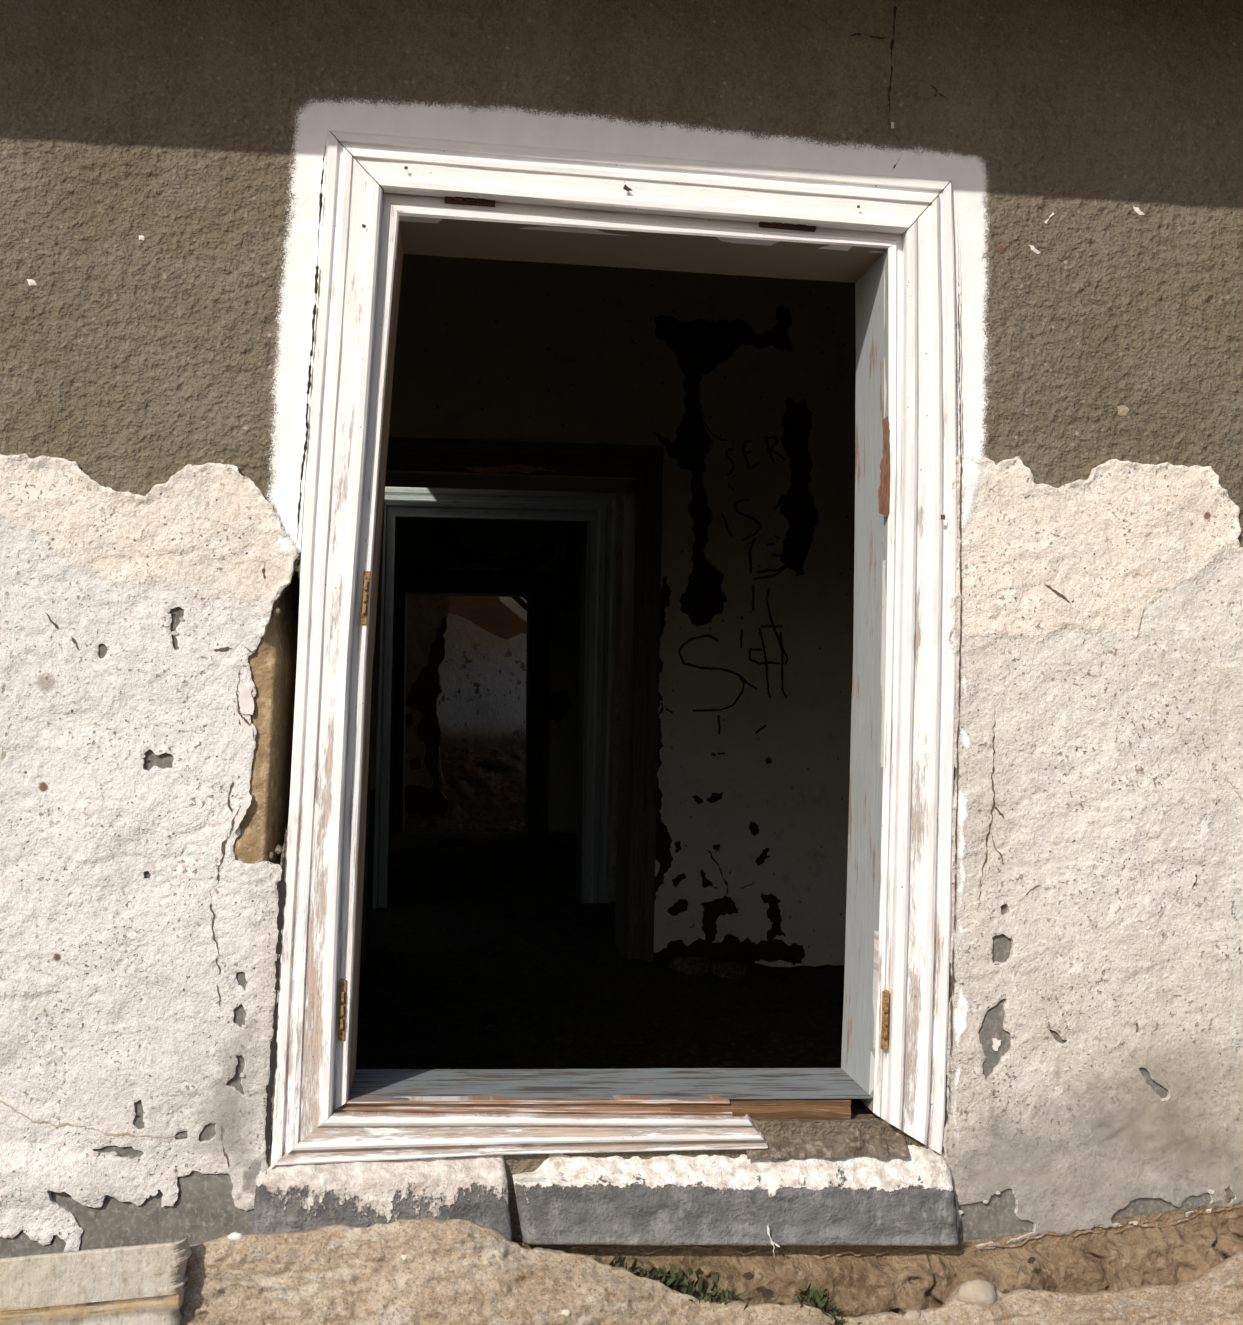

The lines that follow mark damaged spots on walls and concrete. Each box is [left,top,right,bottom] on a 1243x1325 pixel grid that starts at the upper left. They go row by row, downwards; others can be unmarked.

crack [848,0,899,168]
peeling [165,607,185,650]
peeling [653,305,805,966]
crack [947,224,1004,1123]
peeling [140,749,174,771]
spalling [233,587,300,864]
peeling [992,934,1012,964]
peeling [234,972,247,1028]
peeling [978,999,1014,1079]
peeling [93,1145,144,1163]
peeling [132,1100,144,1129]
peeling [0,1171,254,1258]